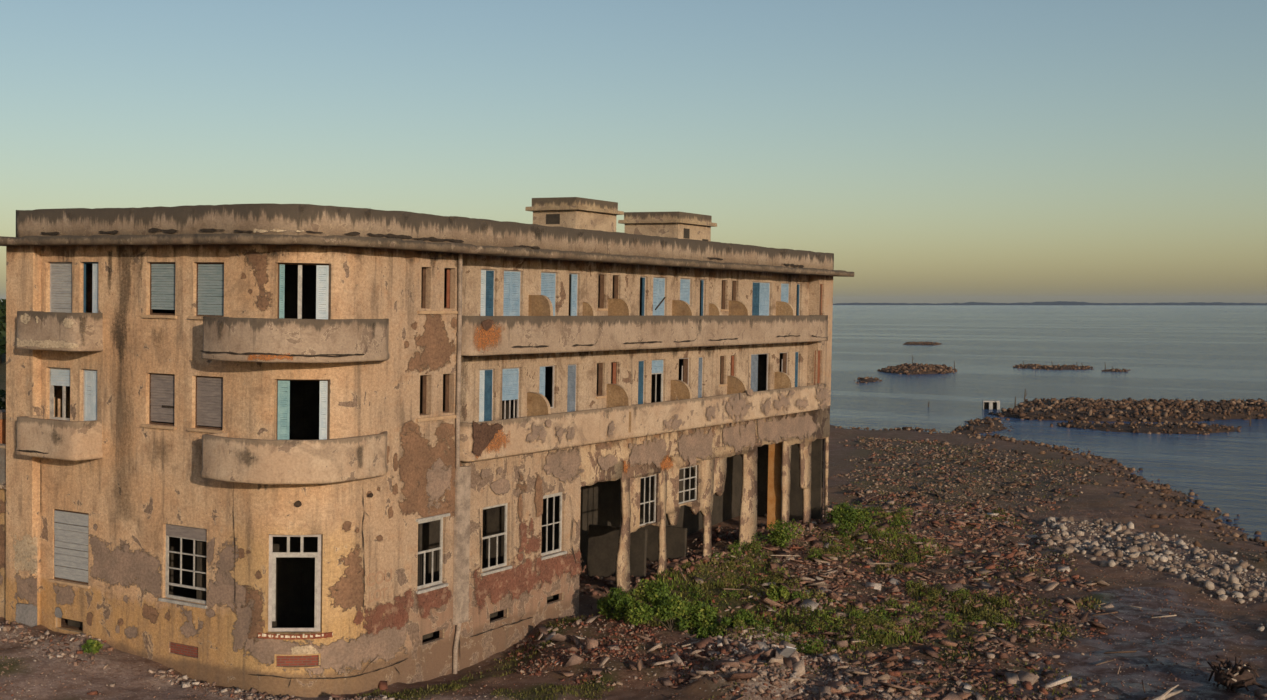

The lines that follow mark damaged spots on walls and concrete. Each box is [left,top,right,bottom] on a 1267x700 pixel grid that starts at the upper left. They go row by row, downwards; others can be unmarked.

damp [108,248,143,353]
peeling [241,249,284,311]
peeling [404,309,457,374]
corrosion [474,324,502,351]
peeling [366,420,462,519]
flaking render [629,414,682,470]
flaking render [706,382,831,455]
flaking render [472,419,586,615]
flaking render [0,500,37,608]
flaking render [52,583,75,606]
flaking render [88,521,452,678]